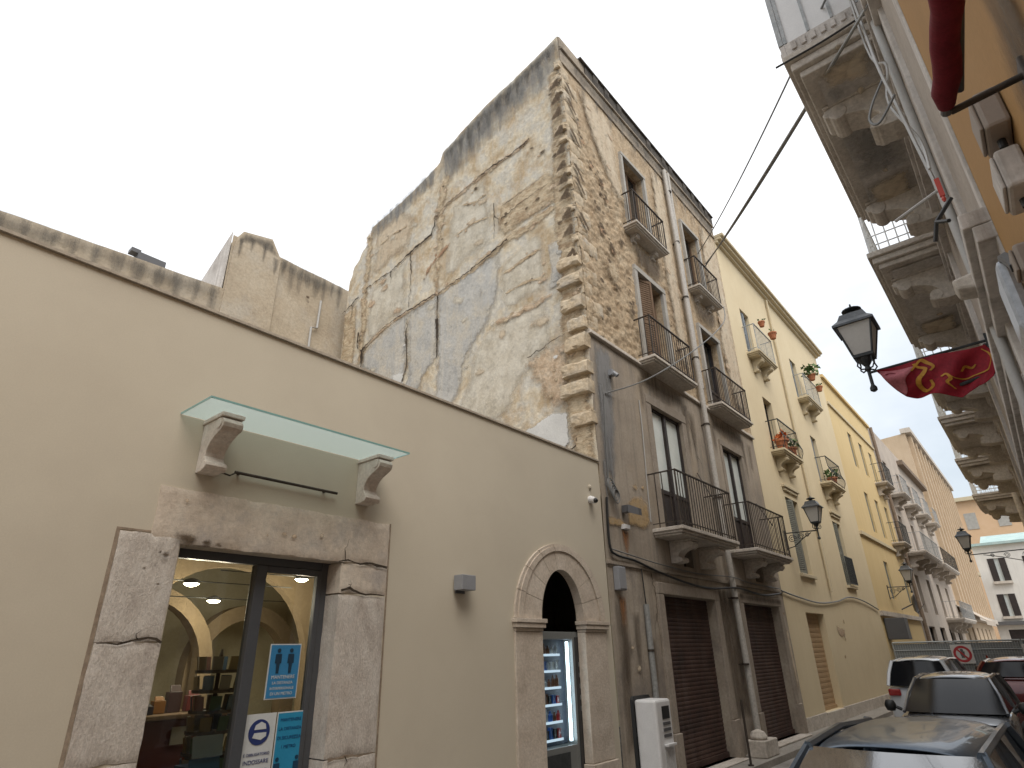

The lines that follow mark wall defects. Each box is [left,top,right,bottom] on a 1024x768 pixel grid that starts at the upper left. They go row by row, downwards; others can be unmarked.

leakage [445,45,552,171]
leakage [376,174,432,231]
spalling [341,69,635,364]
crack [342,219,436,382]
crack [432,296,440,358]
spalling [566,393,594,457]
crack [339,541,387,596]
crack [96,631,162,645]